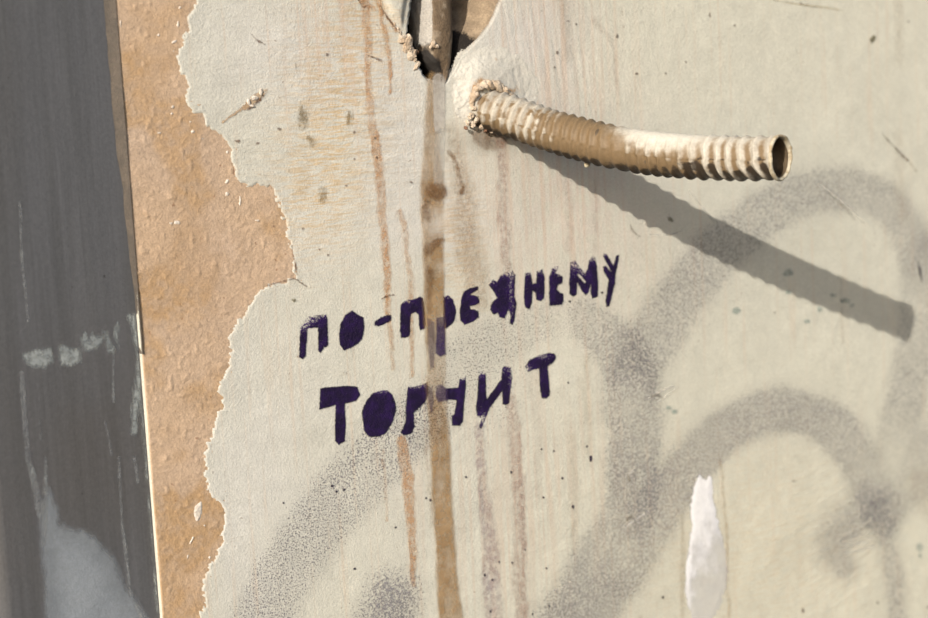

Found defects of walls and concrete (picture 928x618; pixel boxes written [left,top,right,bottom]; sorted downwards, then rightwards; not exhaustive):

spalling [393,22,428,79]
spalling [449,0,498,70]
peeling [116,0,302,618]
rust [382,228,390,314]
peeling [42,494,145,618]
rust [398,437,416,582]